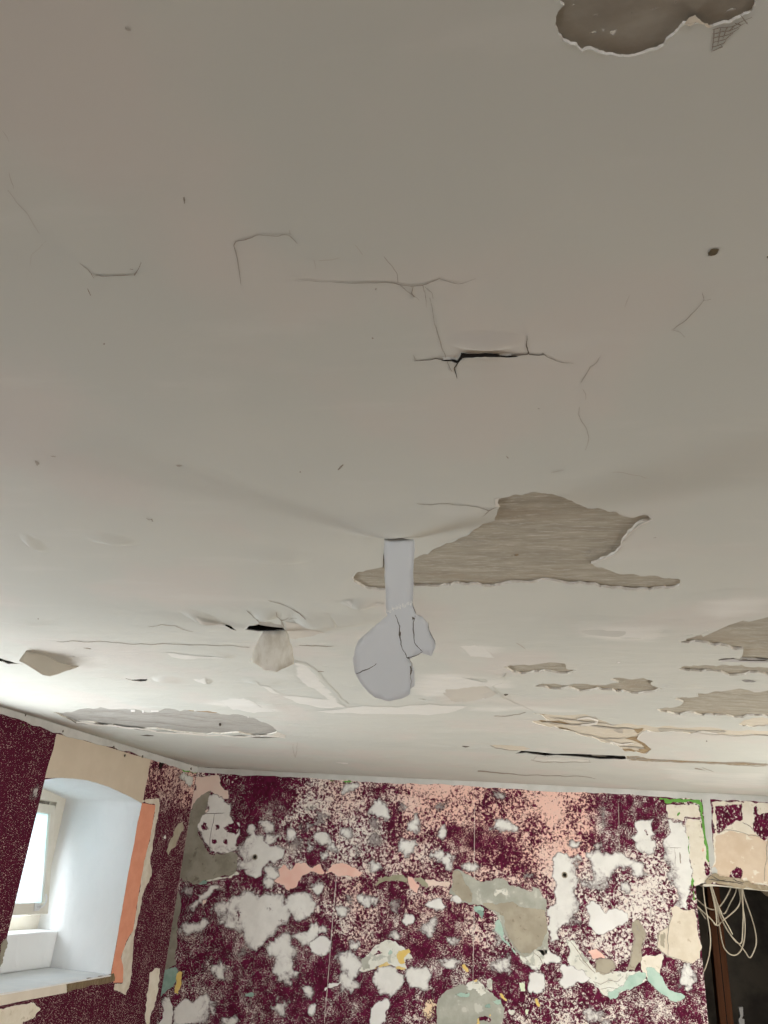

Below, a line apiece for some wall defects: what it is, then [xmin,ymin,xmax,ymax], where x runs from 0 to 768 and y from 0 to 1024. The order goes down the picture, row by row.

peeling [555,0,757,57]
crack [81,263,141,277]
crack [233,234,297,284]
crack [305,257,600,450]
peeling [250,491,681,715]
peeling [532,617,768,754]
peeling [54,697,286,738]
flaking render [713,831,768,886]
peeling [449,869,549,970]
peeling [359,940,413,972]
peeling [567,906,702,996]
peeling [436,978,515,1024]